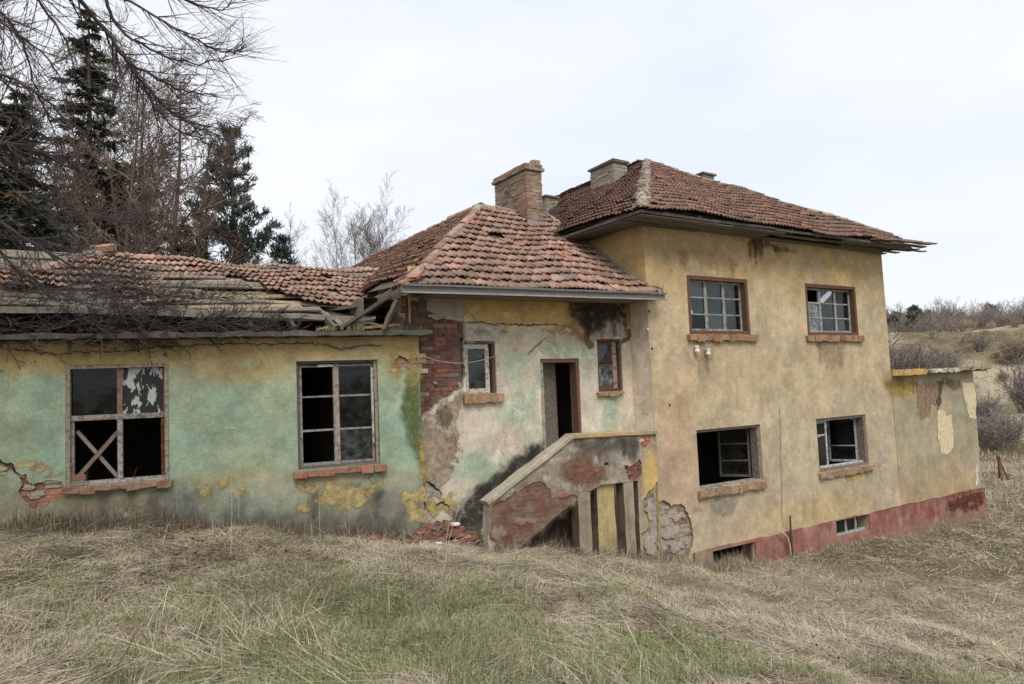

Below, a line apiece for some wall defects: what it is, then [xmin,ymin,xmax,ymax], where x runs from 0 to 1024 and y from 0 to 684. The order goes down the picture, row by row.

damp [570,298,627,334]
flaking render [390,295,509,523]
peeling [916,367,976,455]
crack [0,459,26,478]
flaking render [0,459,86,511]
peeling [296,474,383,515]
flaking render [486,462,608,550]
flaking render [638,481,699,560]
flaking render [945,462,984,512]